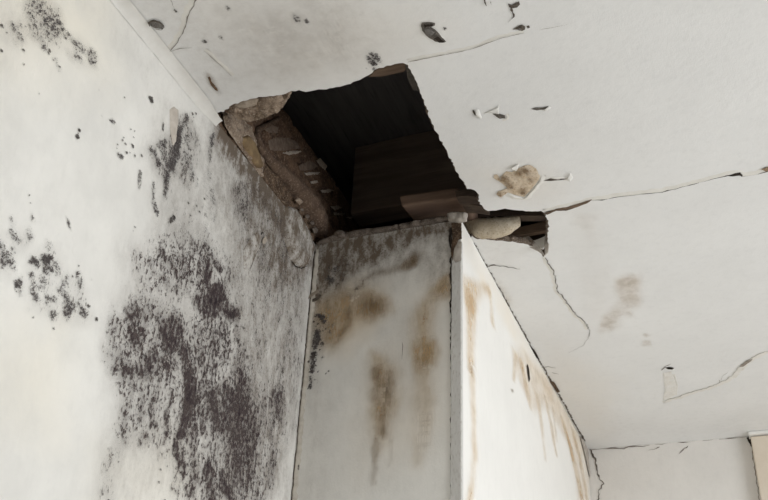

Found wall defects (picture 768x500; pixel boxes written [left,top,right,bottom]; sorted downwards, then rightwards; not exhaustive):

damp [0,0,97,68]
crack [167,0,196,52]
spalling [421,22,446,43]
crack [407,30,524,62]
spalling [473,106,509,121]
damp [117,113,200,217]
flaking render [218,109,462,263]
peeling [494,164,573,200]
crack [542,167,768,215]
damp [15,242,98,330]
damp [102,181,379,500]
crack [449,225,768,499]